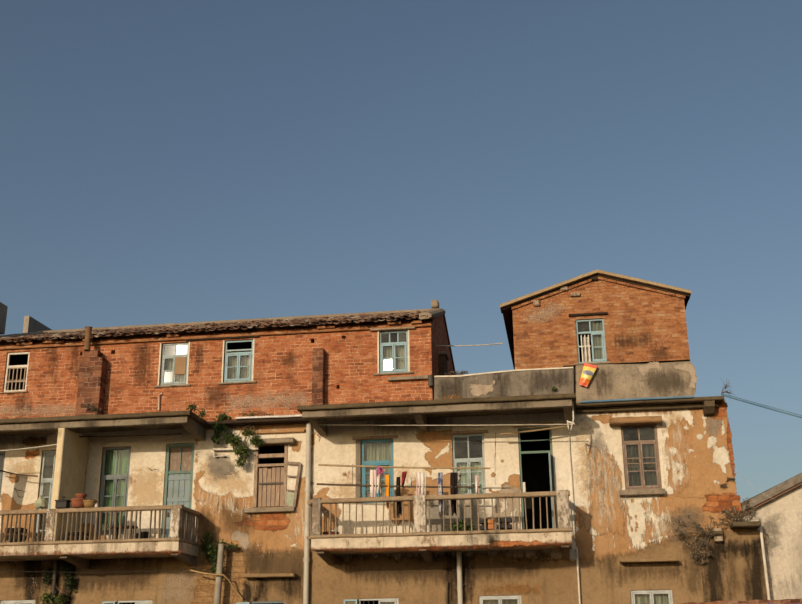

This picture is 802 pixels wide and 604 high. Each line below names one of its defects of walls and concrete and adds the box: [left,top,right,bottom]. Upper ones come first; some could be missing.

spalling [467,377,495,396]
peeling [591,414,612,424]
peeling [193,470,208,506]
peeling [303,487,341,535]
peeling [388,429,453,525]
spalling [487,474,522,530]
peeling [579,446,668,551]
peeling [664,400,742,513]
spalling [191,512,297,604]